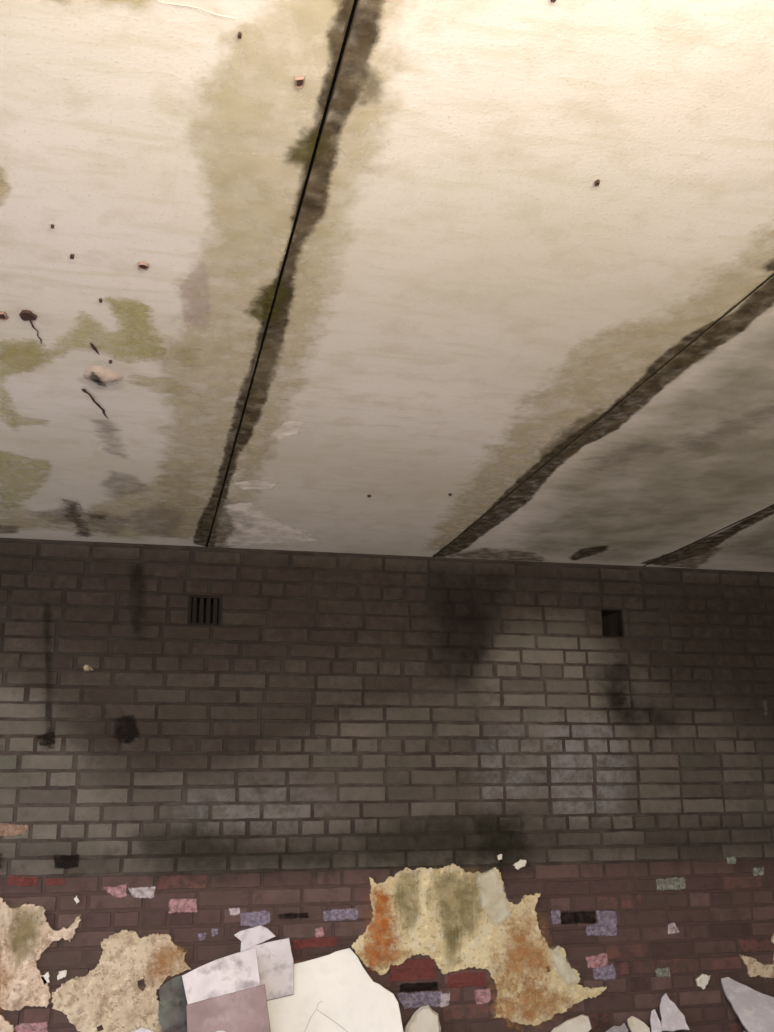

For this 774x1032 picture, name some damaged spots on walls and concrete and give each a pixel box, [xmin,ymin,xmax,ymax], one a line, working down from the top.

damp [0,0,384,548]
damp [433,254,774,569]
peeling [107,885,156,898]
peeling [656,877,686,890]
flaking render [0,896,191,1032]
peeling [229,908,308,927]
peeling [293,909,358,948]
flaking render [351,854,617,1026]
flaking render [695,973,711,989]
flaking render [739,934,774,978]